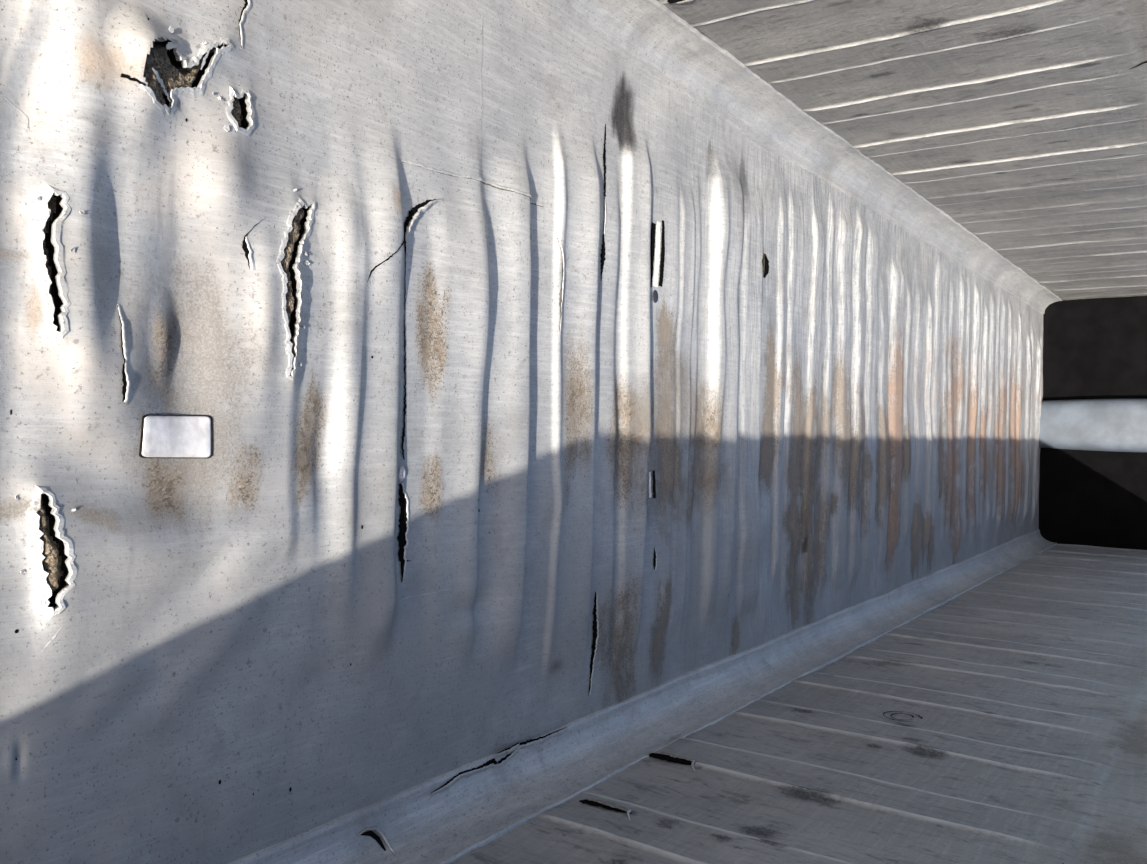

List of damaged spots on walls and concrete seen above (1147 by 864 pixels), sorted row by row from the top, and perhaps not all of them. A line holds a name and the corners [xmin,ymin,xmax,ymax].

crack [239,0,252,49]
crack [599,124,607,281]
crack [117,304,131,405]
crack [367,159,565,582]
corrosion [563,325,595,500]
corrosion [607,302,725,528]
corrosion [759,325,1023,628]
crack [589,591,599,696]
crack [431,727,568,797]